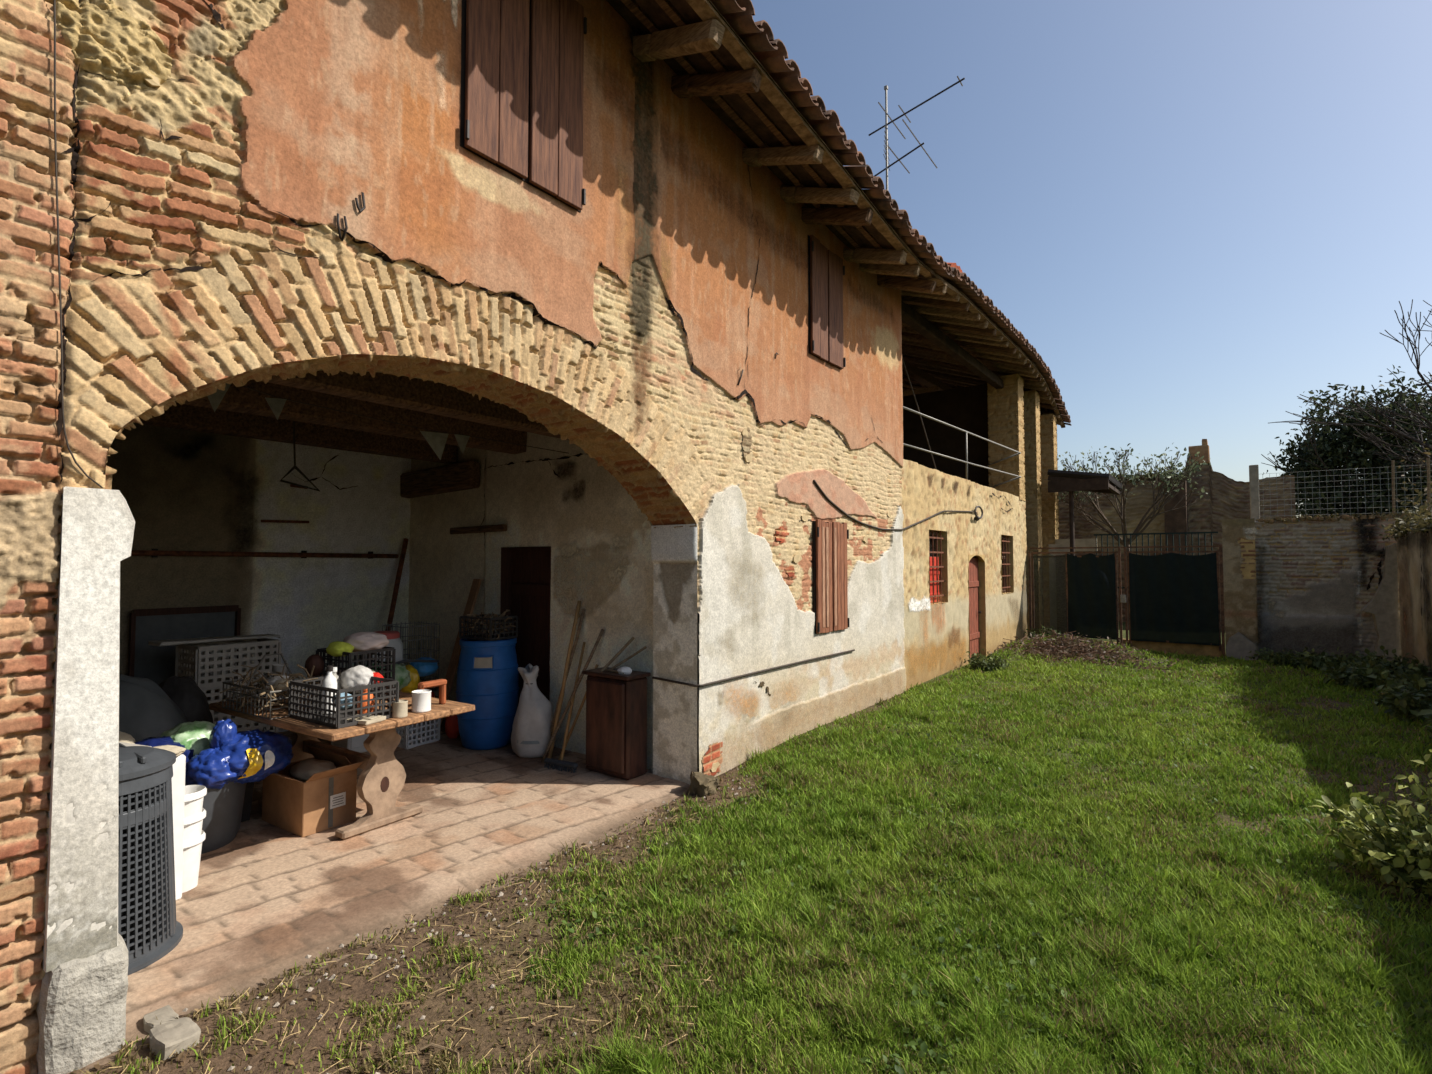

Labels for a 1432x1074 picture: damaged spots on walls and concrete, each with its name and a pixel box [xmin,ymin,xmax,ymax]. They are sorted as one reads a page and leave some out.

peeling [48,578,59,772]
crack [57,64,205,483]
peeling [69,0,435,291]
damp [629,25,669,430]
peeling [573,254,903,612]
crack [600,168,885,450]
crack [1367,548,1384,590]